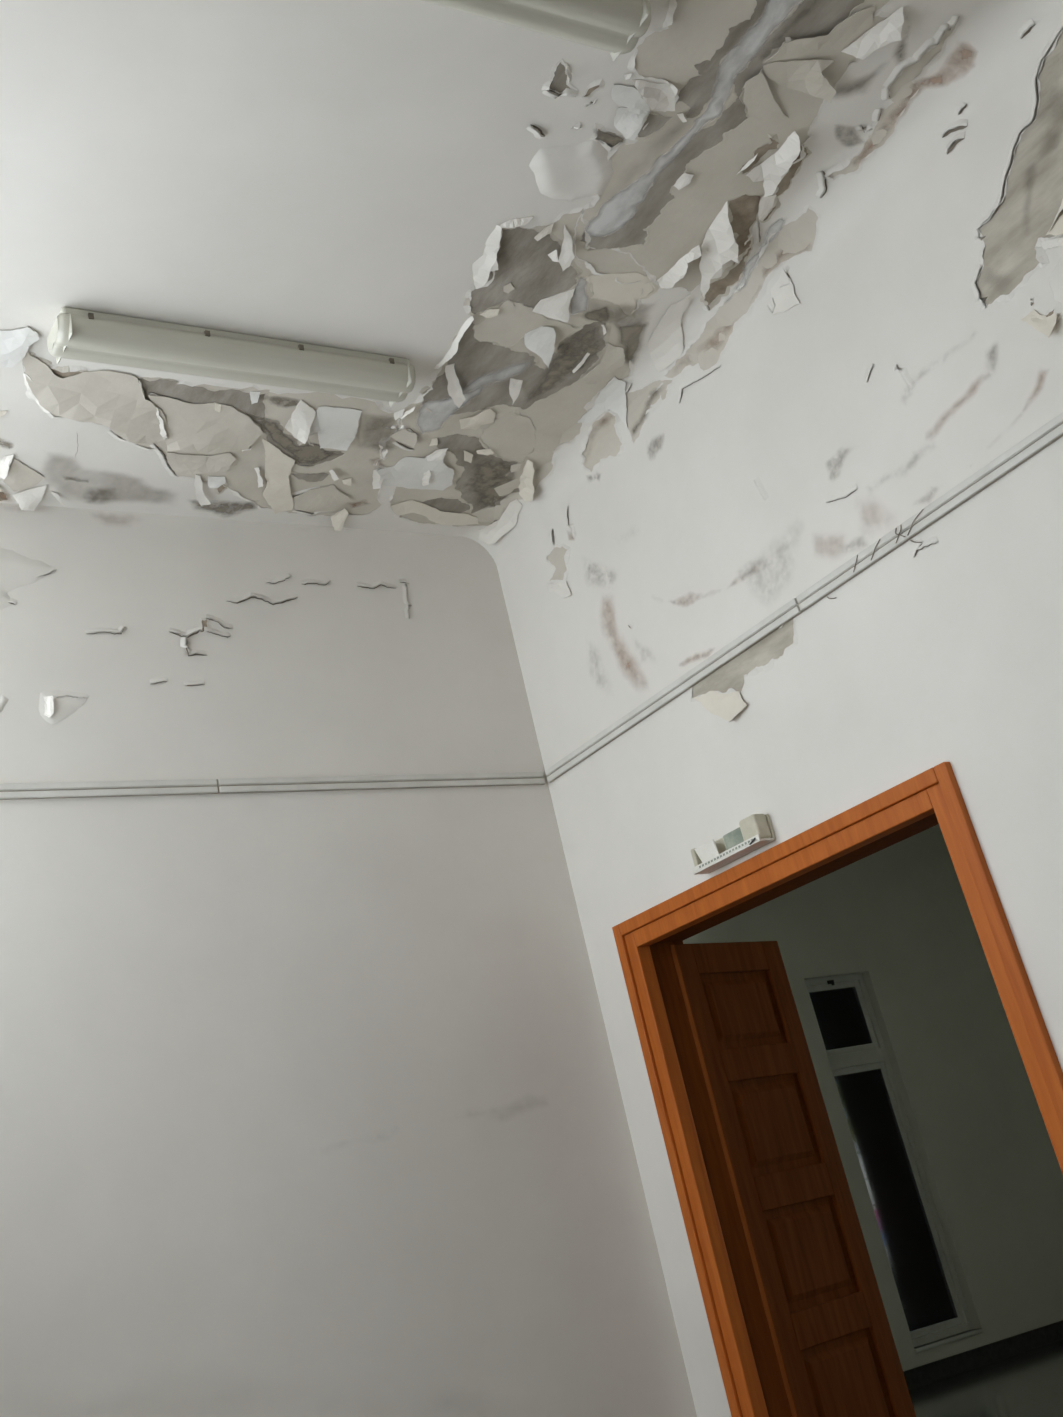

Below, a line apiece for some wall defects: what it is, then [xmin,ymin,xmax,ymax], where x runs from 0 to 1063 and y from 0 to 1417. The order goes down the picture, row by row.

peeling [971,11,1063,338]
peeling [0,0,972,545]
crack [85,625,125,635]
crack [149,573,411,686]
peeling [690,618,798,722]